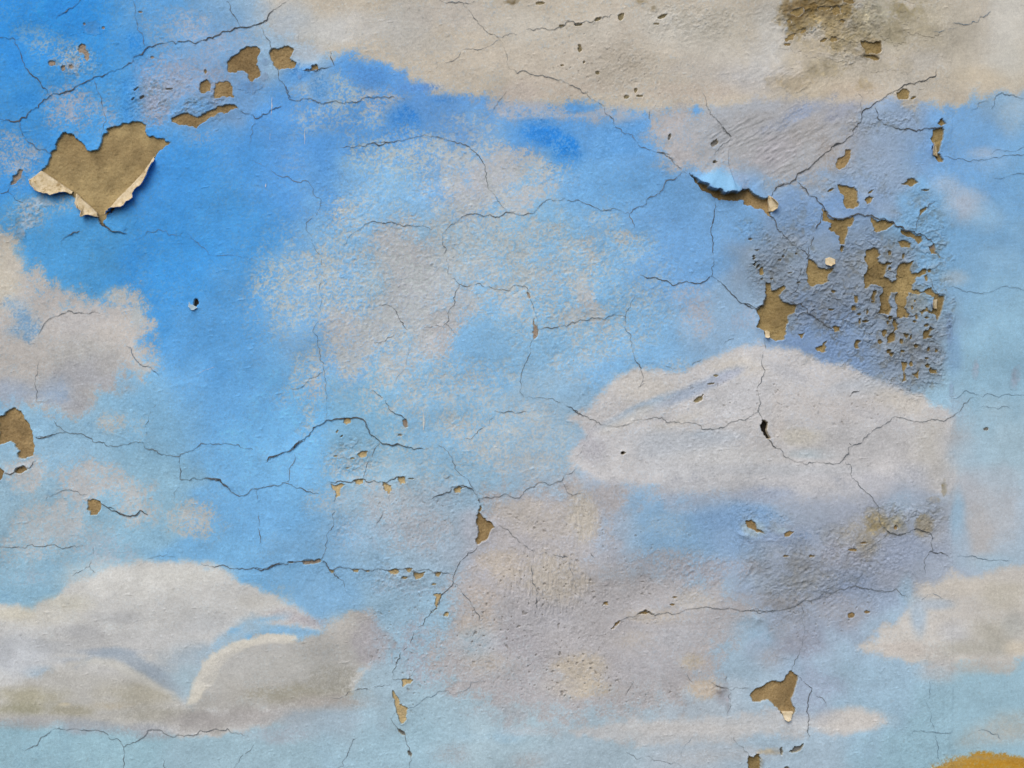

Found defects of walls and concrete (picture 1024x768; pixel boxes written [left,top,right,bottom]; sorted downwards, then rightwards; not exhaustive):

peeling [172,46,334,128]
peeling [1,122,169,234]
peeling [694,179,779,216]
crack [644,75,942,330]
peeling [798,185,872,293]
crack [944,147,1023,179]
crack [0,0,780,699]
peeling [753,256,796,341]
peeling [851,218,943,381]
peeling [0,408,35,480]
crack [620,390,1010,667]
peeling [750,671,812,733]